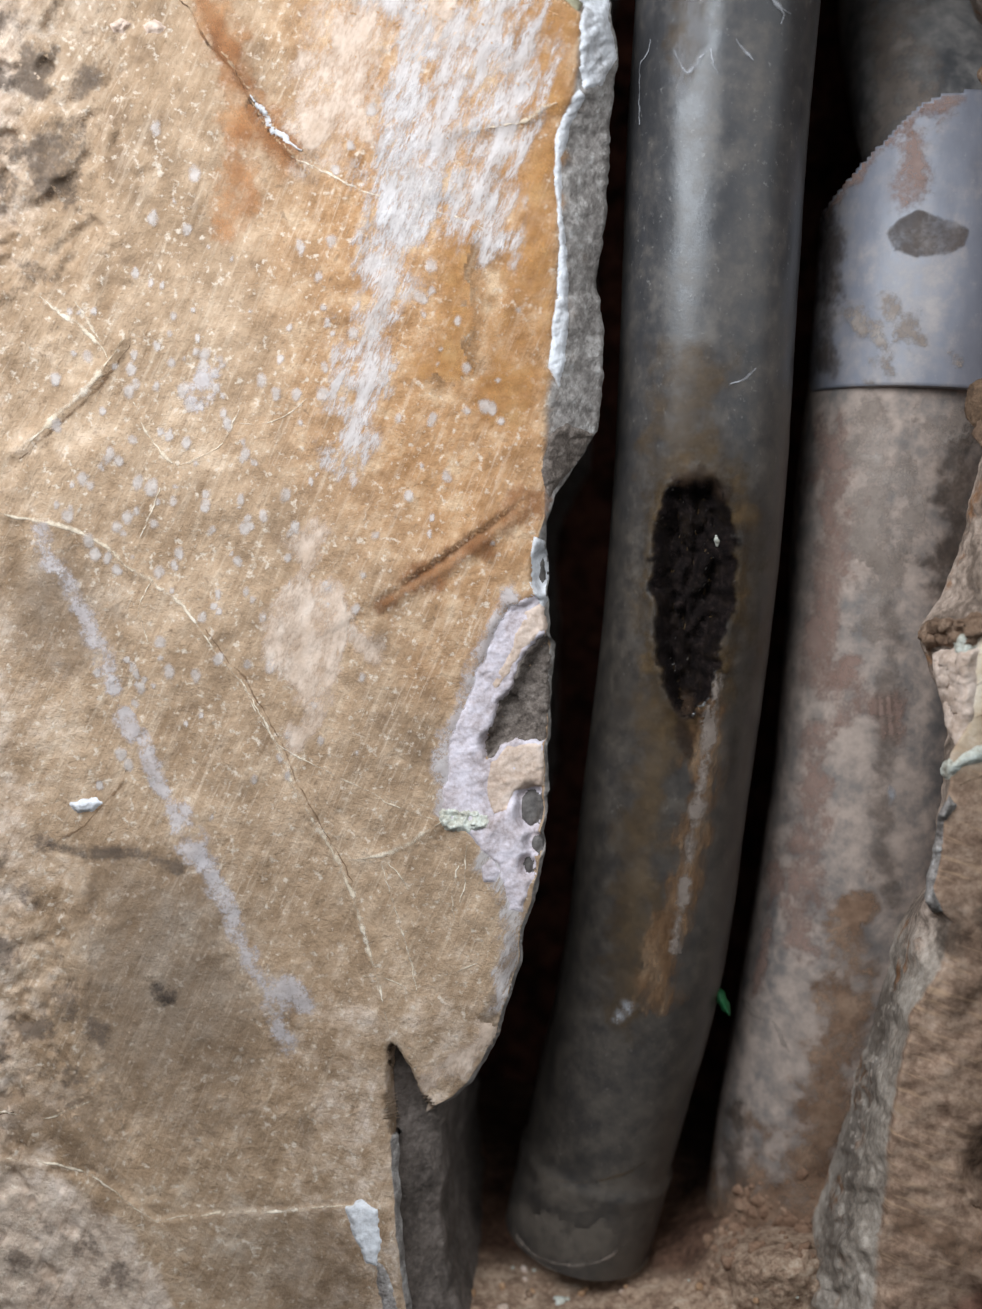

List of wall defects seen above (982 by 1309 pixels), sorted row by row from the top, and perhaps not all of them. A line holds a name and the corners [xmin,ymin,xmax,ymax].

crack [19,296,130,459]
rust [198,0,297,238]
crack [181,1,487,231]
damp [320,0,559,484]
rust [419,204,536,413]
flaking render [548,0,617,387]
damp [43,552,121,694]
crack [5,399,441,1066]
rust [377,486,546,610]
flaking render [918,611,982,744]
damp [36,707,313,1044]
flaking render [345,537,552,1309]